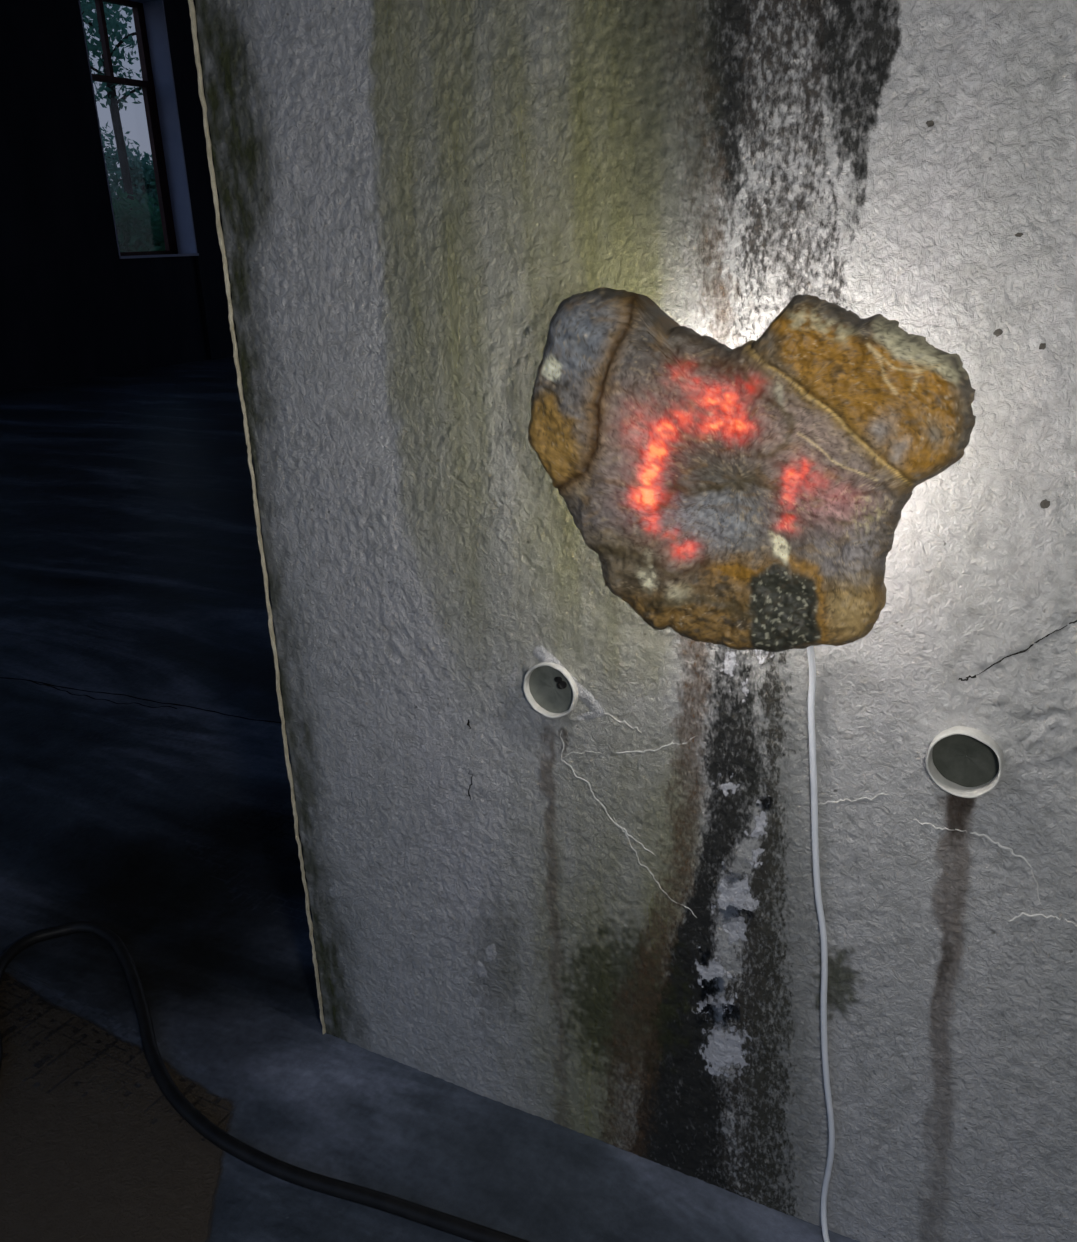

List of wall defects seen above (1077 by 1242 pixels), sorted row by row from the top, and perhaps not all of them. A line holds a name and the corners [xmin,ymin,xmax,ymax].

damp [653,0,900,342]
crack [958,620,1077,681]
damp [580,636,796,1216]